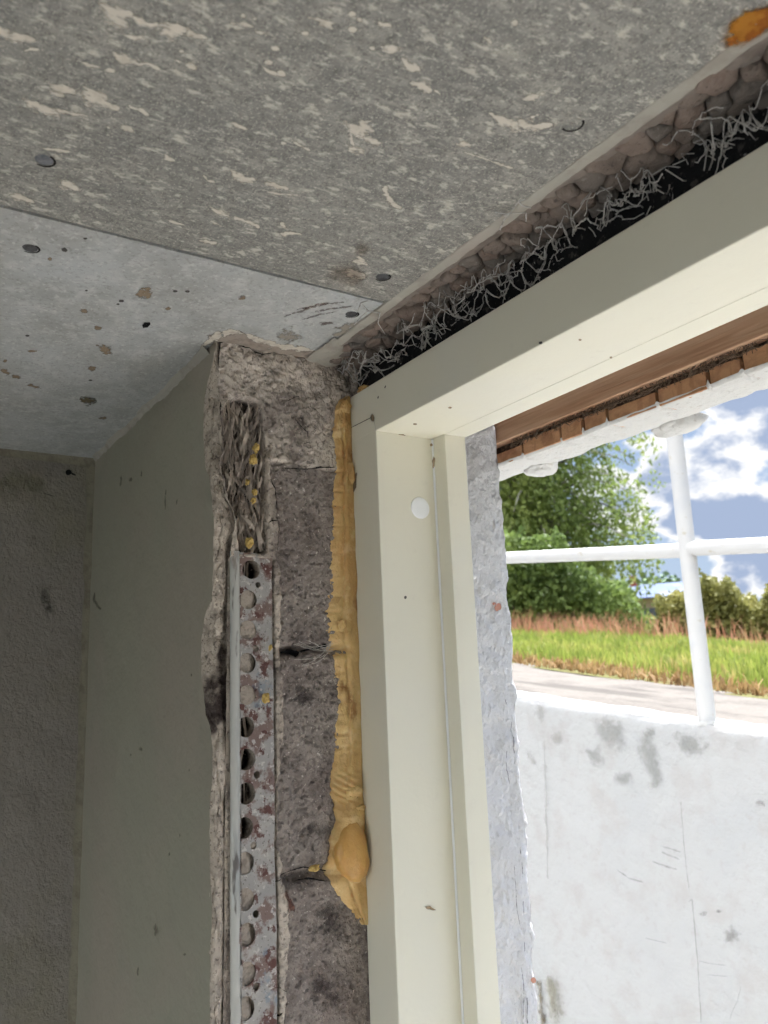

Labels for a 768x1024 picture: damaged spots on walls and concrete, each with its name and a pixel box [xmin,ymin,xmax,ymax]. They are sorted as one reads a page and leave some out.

spalling [201,342,235,1024]